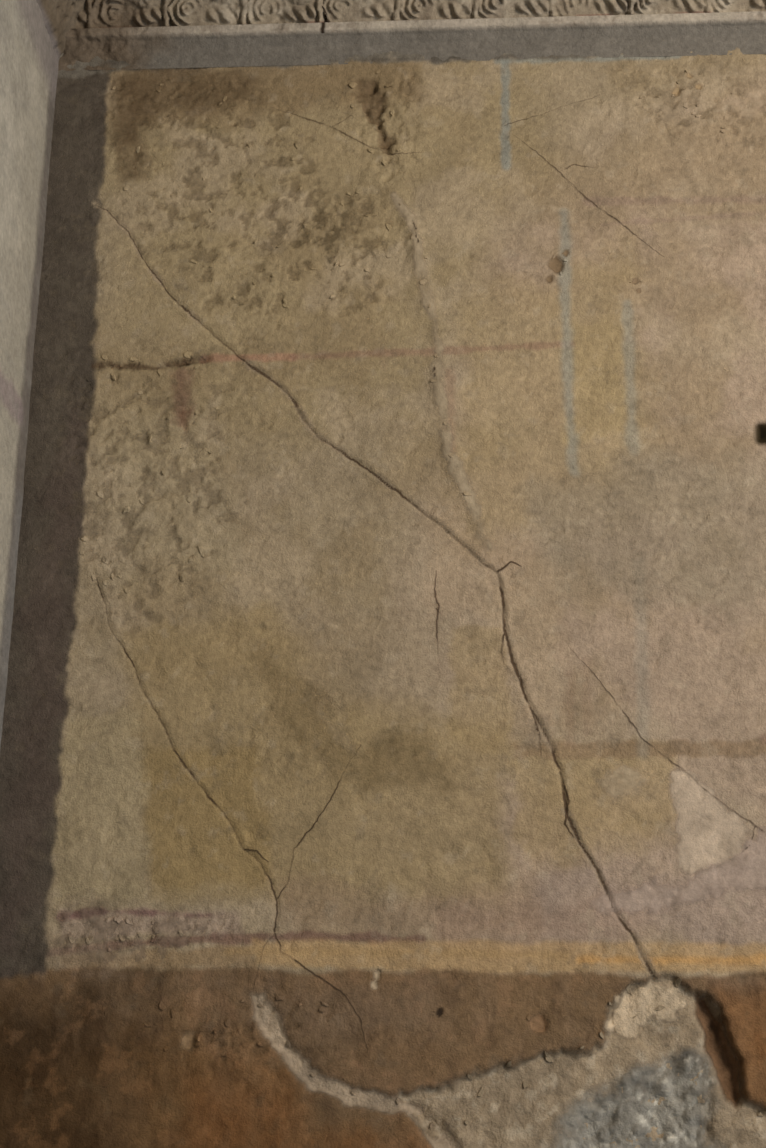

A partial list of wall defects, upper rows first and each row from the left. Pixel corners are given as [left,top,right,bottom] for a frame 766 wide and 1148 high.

crack [94,202,201,323]
crack [174,749,217,805]
crack [235,353,663,982]
crack [573,651,680,767]
crack [244,849,368,1052]
flaking render [252,976,766,1148]